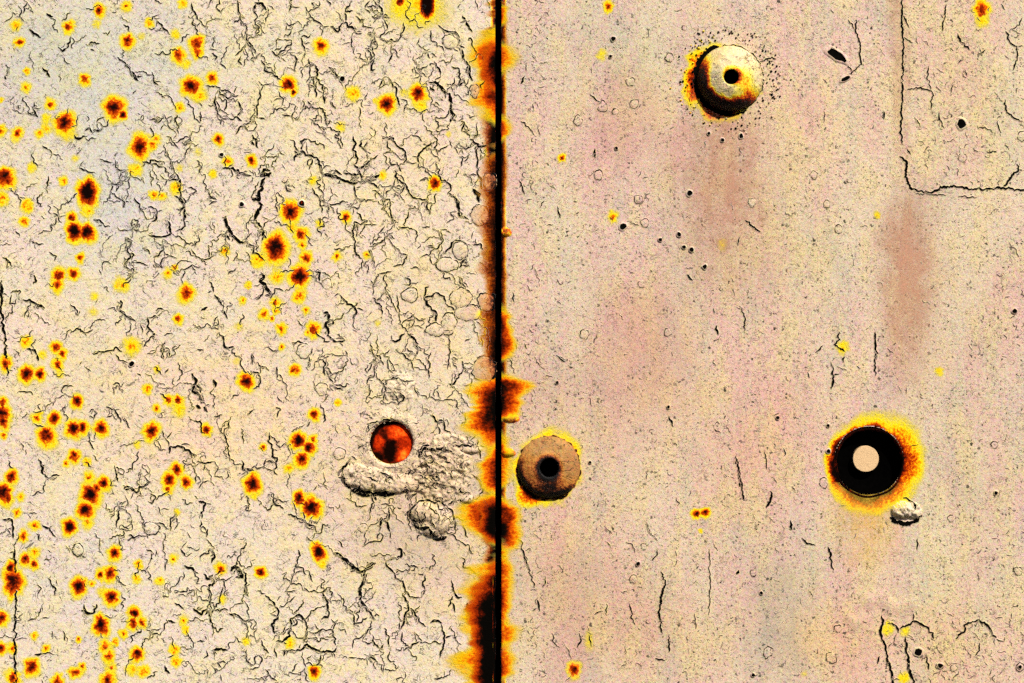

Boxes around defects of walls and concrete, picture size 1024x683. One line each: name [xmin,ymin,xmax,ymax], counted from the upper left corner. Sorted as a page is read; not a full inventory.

rust [386,0,445,33]
rust [971,0,992,27]
rust [681,43,741,123]
rust [50,174,101,296]
rust [251,198,323,351]
crack [0,0,492,683]
rust [450,0,582,683]
crack [509,0,1024,683]
rust [370,421,413,464]
rust [690,507,711,534]
rust [823,412,925,526]